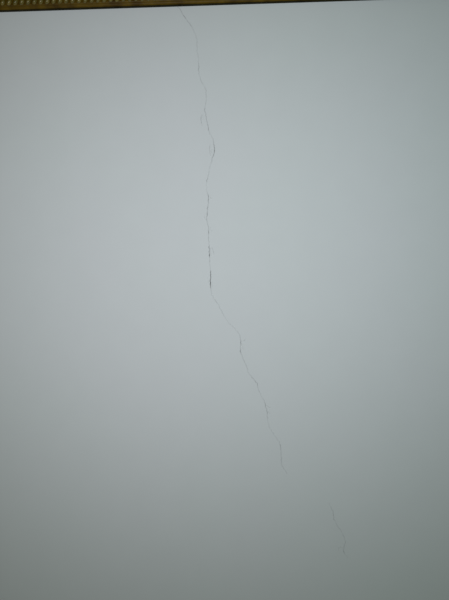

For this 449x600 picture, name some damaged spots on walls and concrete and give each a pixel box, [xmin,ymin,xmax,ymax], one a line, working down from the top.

crack [178,7,287,474]